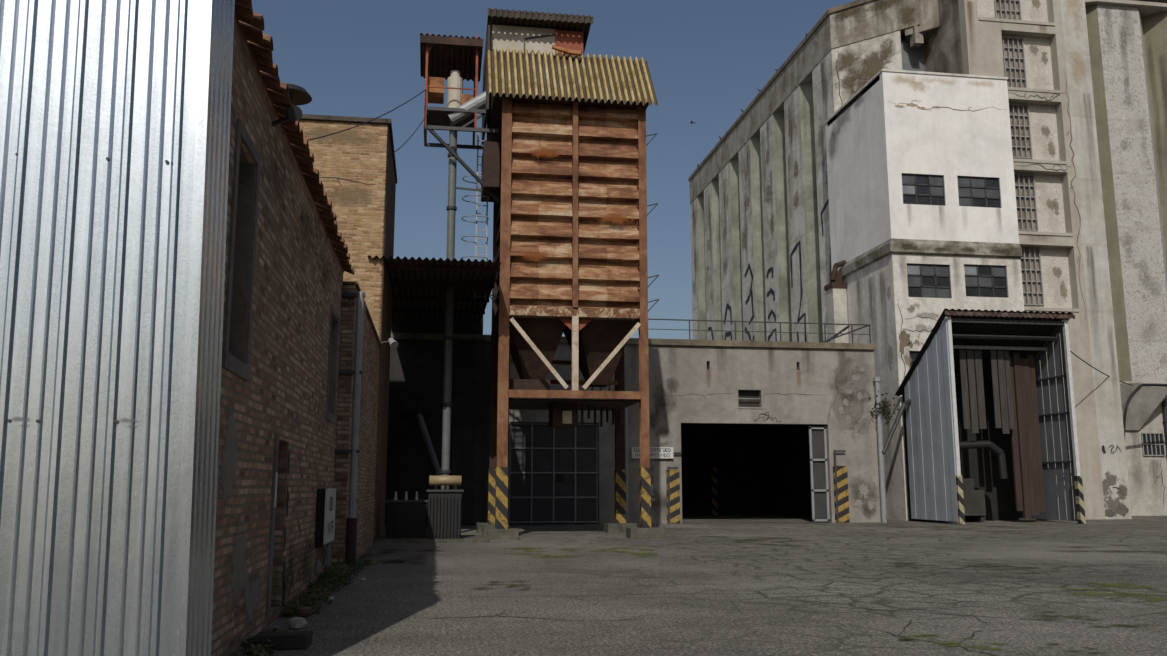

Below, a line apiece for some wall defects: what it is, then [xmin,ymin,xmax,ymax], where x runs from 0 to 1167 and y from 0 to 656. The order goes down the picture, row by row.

water stain [837,41,893,95]
crack [888,77,1086,315]
spalling [1102,472,1129,517]